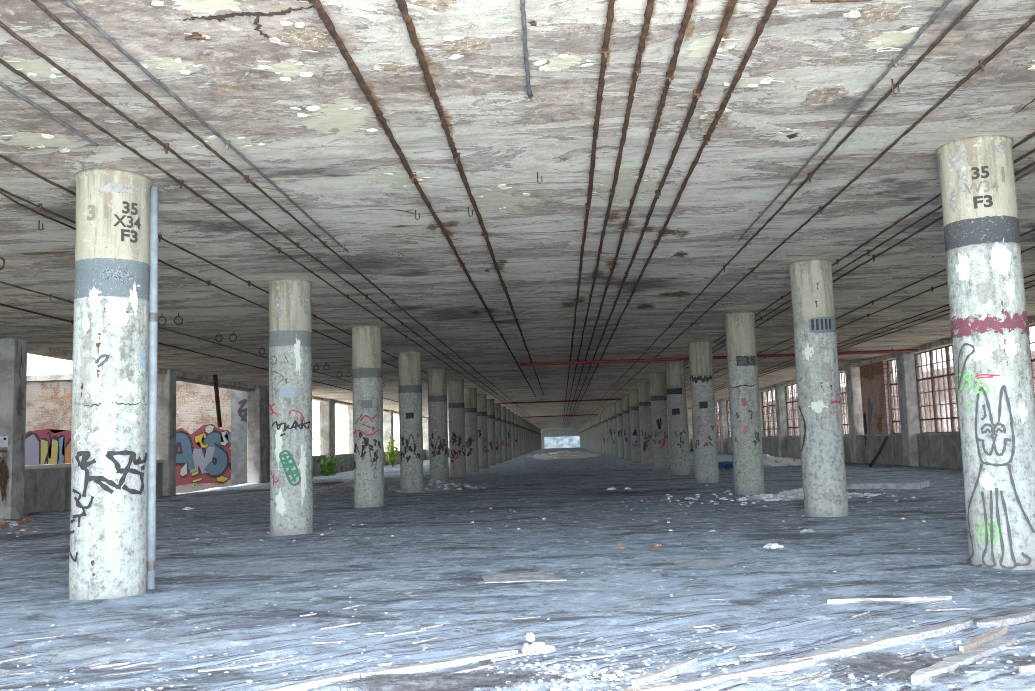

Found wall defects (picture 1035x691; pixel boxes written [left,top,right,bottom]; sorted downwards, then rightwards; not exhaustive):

peeling [151,0,243,18]
spalling [184,32,210,42]
crack [183,6,315,38]
spalling [810,0,931,53]
peeling [290,95,379,143]
peeling [82,283,140,355]
peeling [80,370,138,423]